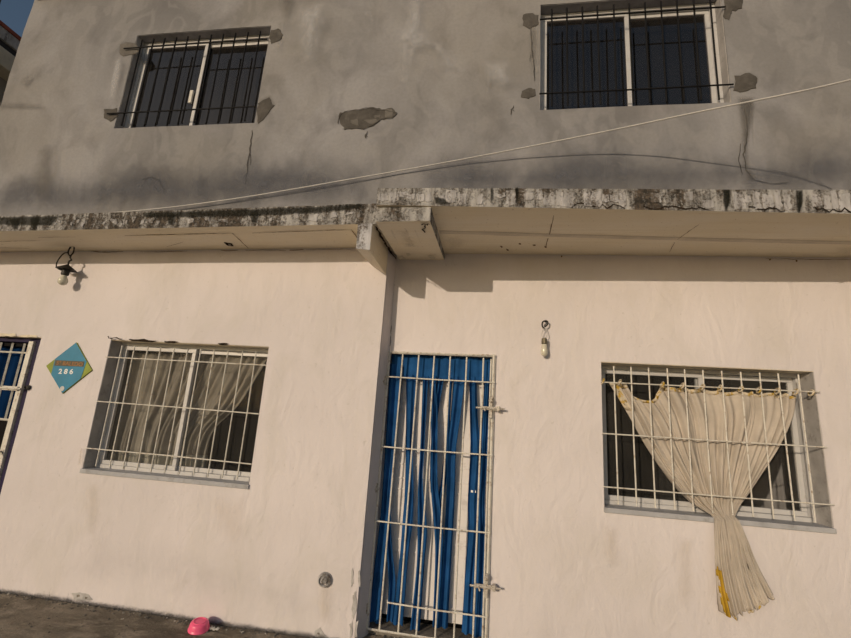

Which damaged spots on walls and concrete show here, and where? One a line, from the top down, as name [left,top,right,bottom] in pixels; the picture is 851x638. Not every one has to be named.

spalling [338,107,397,130]
water stain [741,99,751,136]
crack [246,132,254,173]
crack [738,129,788,184]
water stain [98,170,338,200]
water stain [144,204,361,224]